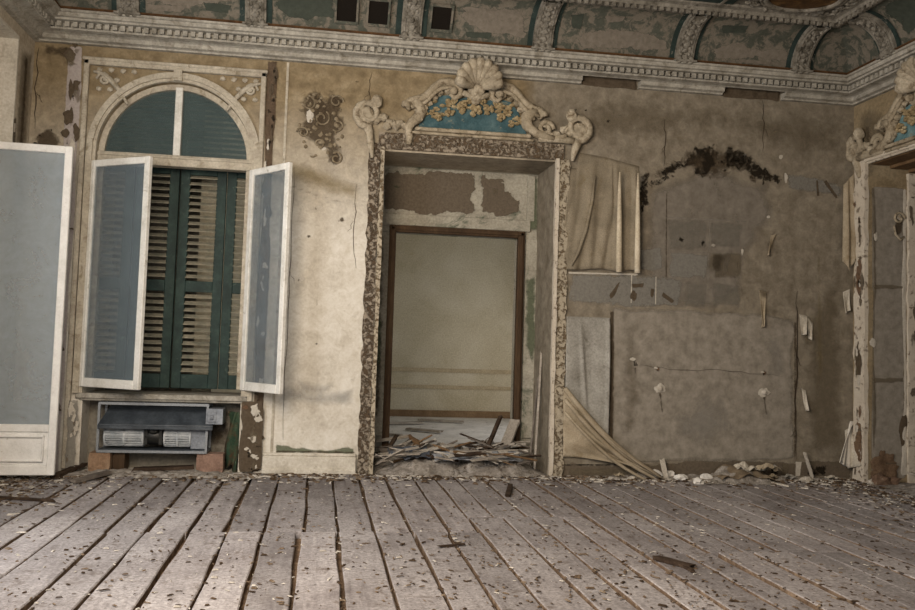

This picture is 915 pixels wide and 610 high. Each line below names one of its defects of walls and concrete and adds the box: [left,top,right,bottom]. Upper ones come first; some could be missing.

peeling [145,0,231,13]
peeling [276,0,335,21]
peeling [461,6,526,39]
peeling [571,14,667,51]
peeling [63,43,78,66]
peeling [60,79,81,142]
flaking render [384,171,520,217]
damp [640,146,780,239]
flaking render [239,302,266,472]